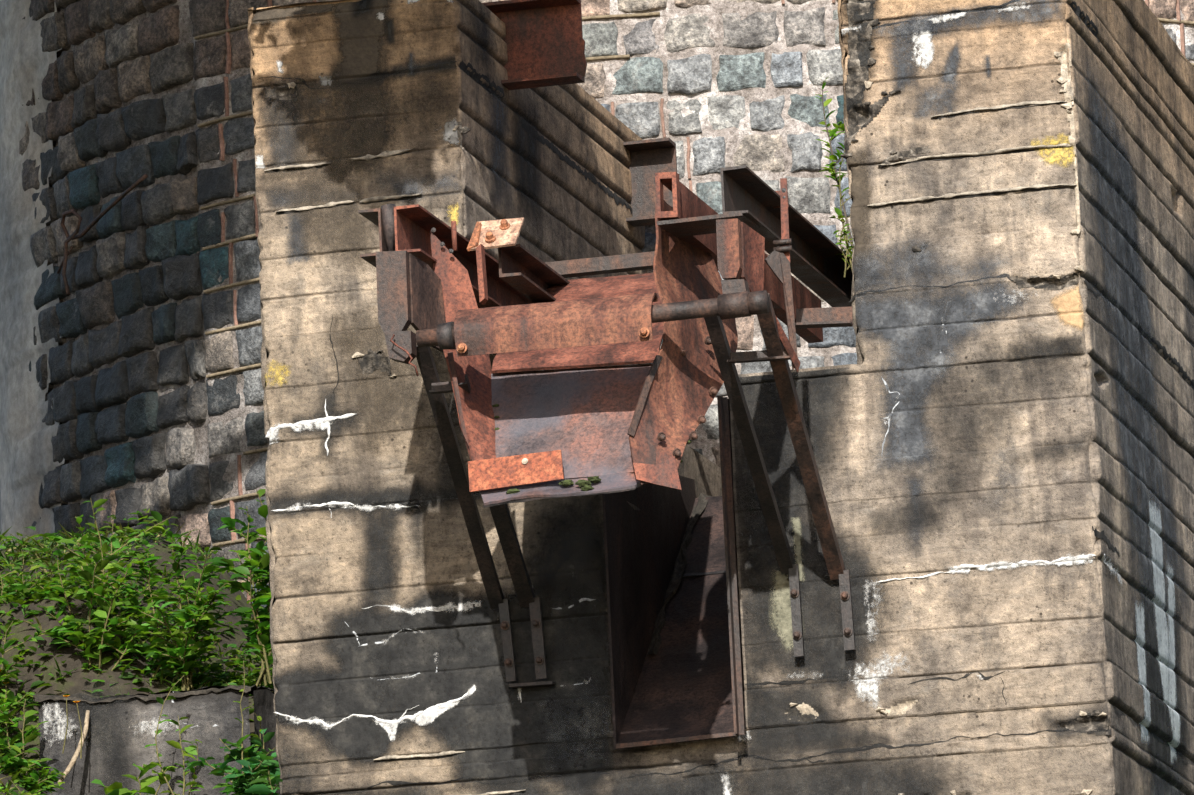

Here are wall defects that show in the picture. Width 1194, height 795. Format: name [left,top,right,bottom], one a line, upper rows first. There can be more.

spalling [840,0,901,159]
crack [266,315,355,456]
crack [271,501,418,515]
crack [875,526,1122,584]
crack [345,602,481,647]
crack [274,685,476,741]